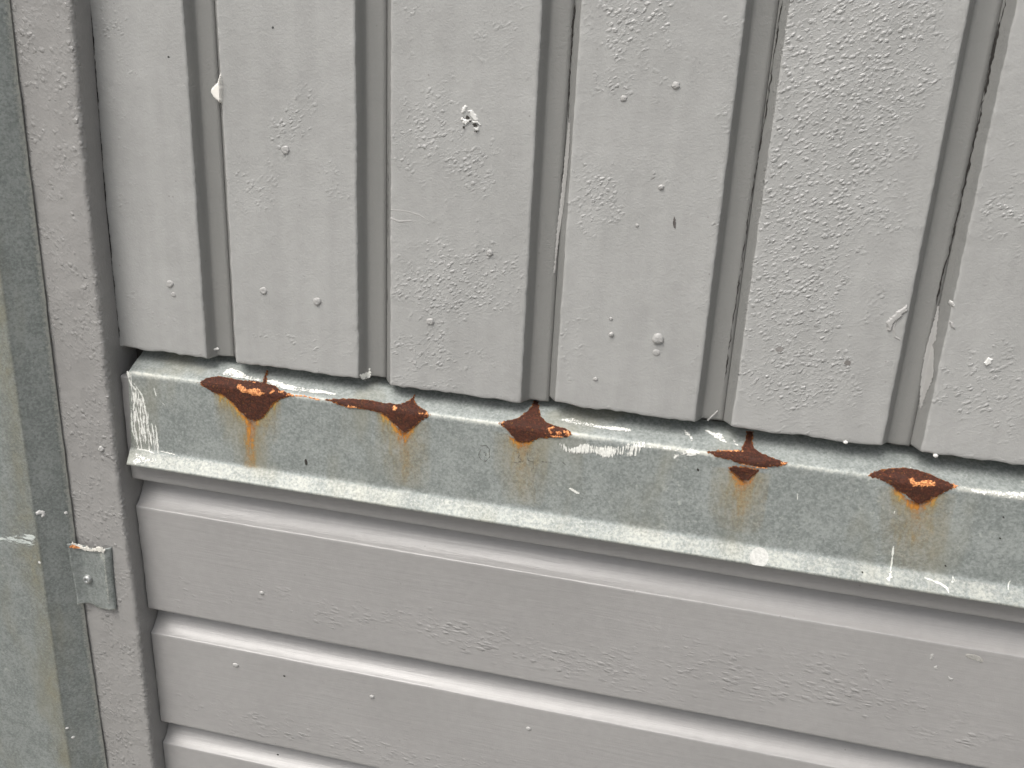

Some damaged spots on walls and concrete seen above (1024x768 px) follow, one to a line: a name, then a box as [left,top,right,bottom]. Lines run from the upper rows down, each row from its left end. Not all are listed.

spalling [461,105,481,133]
rust [200,370,429,464]
rust [499,400,571,449]
rust [707,431,788,499]
rust [868,467,958,514]